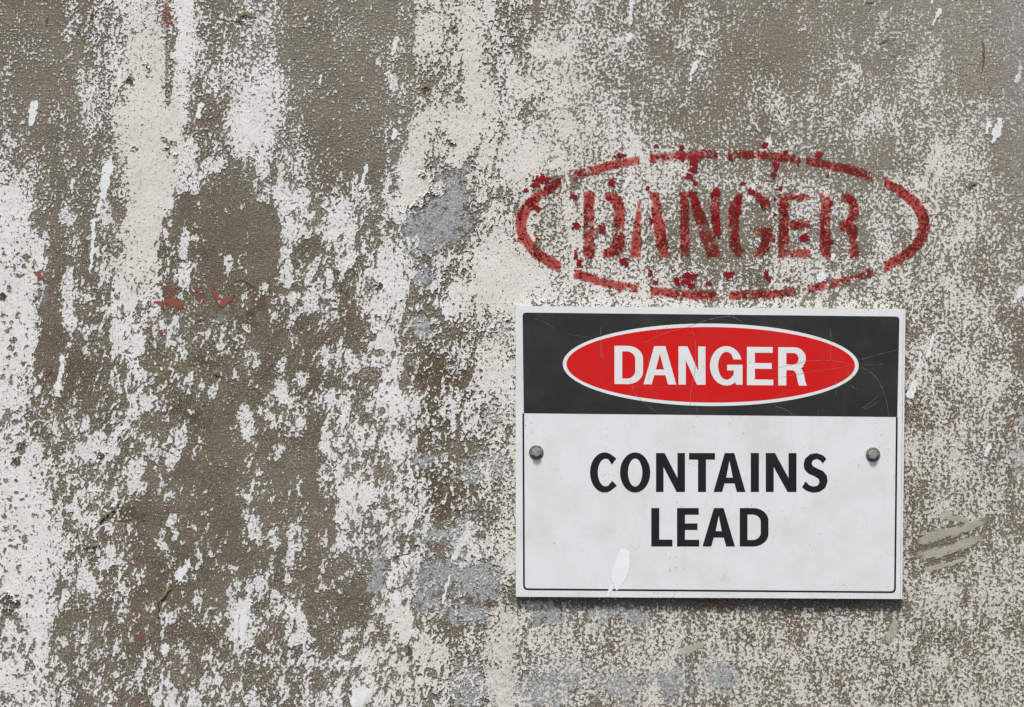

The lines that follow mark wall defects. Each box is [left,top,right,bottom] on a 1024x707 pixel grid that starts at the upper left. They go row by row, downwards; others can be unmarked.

peeling [219,250,253,277]
peeling [210,277,235,311]
peeling [241,282,269,311]
peeling [195,372,233,410]
peeling [267,442,290,461]
peeling [236,461,283,553]